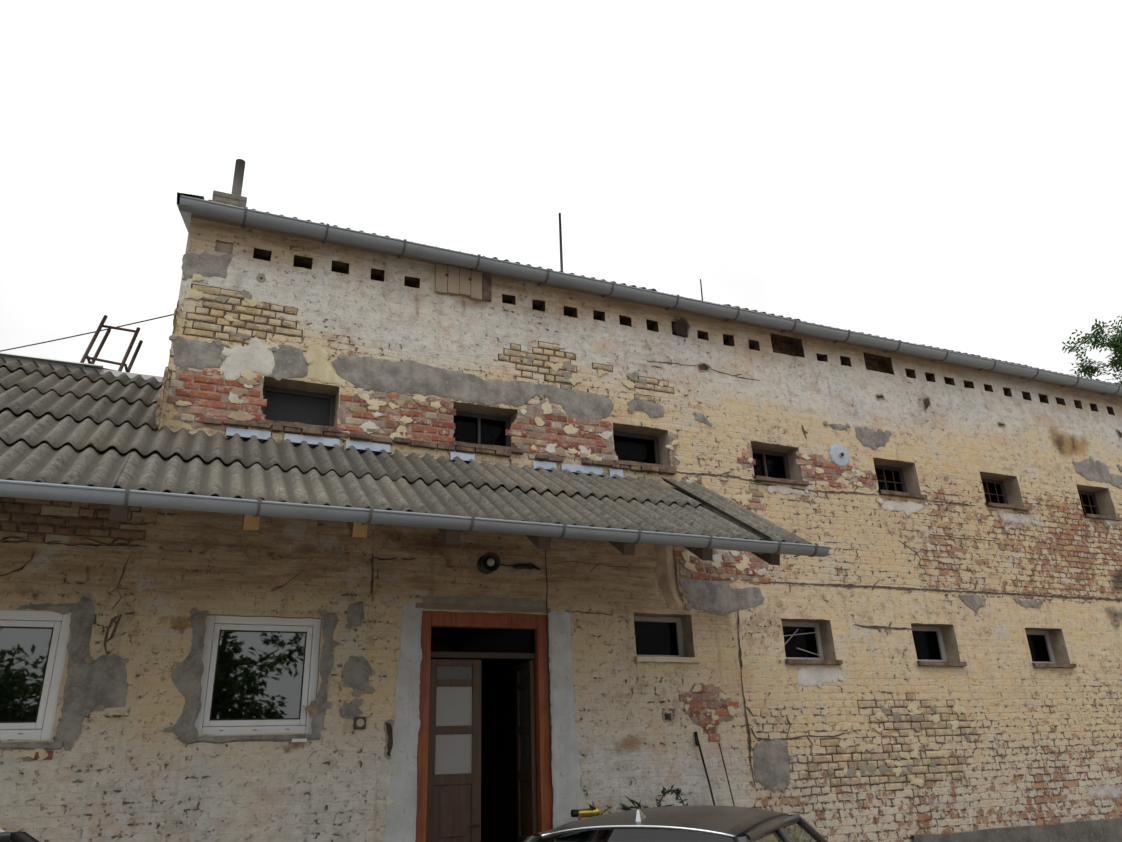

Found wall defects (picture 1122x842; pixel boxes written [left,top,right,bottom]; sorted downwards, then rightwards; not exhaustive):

spalling [155,274,313,432]
spalling [498,341,582,389]
spalling [337,384,456,446]
spalling [505,400,618,468]
crack [930,499,975,507]
crack [0,521,155,655]
spalling [673,546,771,585]
crack [741,534,1122,602]
crack [854,622,912,632]
spalling [662,683,741,742]
crack [737,610,852,788]
spalling [807,693,978,791]